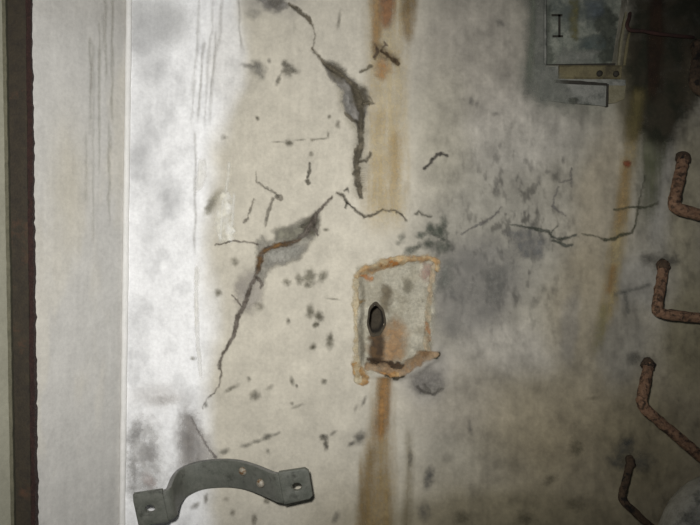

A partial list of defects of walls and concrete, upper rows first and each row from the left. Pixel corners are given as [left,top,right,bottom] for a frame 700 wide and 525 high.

crack [288,3,313,26]
spalling [326,63,367,124]
leakage [626,0,700,207]
crack [423,152,448,169]
spalling [257,215,320,281]
crack [210,47,430,396]
leakage [407,222,444,253]
crack [515,195,576,247]
crack [593,202,654,241]